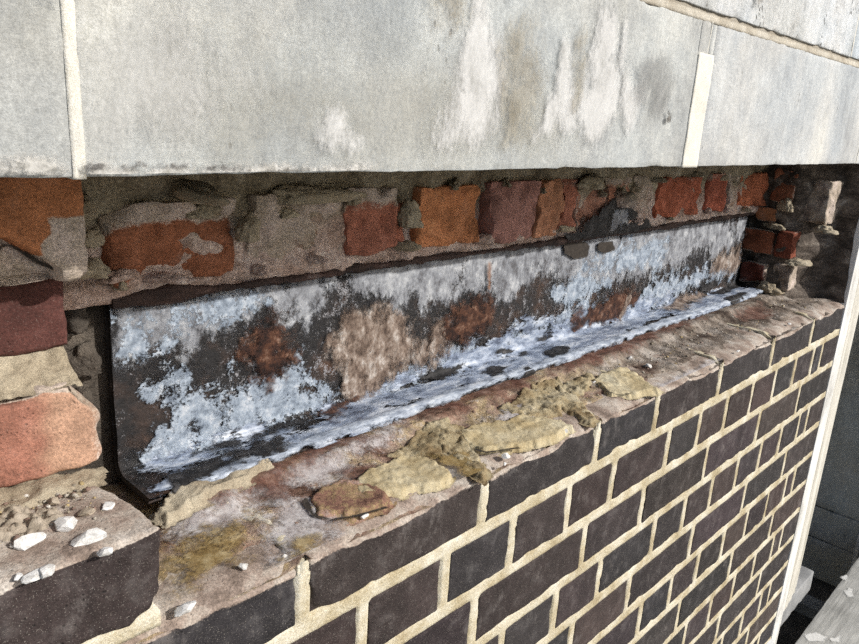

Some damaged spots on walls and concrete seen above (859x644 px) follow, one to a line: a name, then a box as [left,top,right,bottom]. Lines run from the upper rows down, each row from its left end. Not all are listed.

water stain [438,0,505,146]
water stain [535,9,643,142]
water stain [319,113,359,148]
spalling [0,155,69,176]
spalling [84,160,372,174]
rust [317,263,496,420]
water stain [110,217,763,594]
peeling [419,364,464,380]
rust [424,376,533,416]
peeling [537,331,570,357]
rust [560,288,708,367]
rust [249,435,360,499]